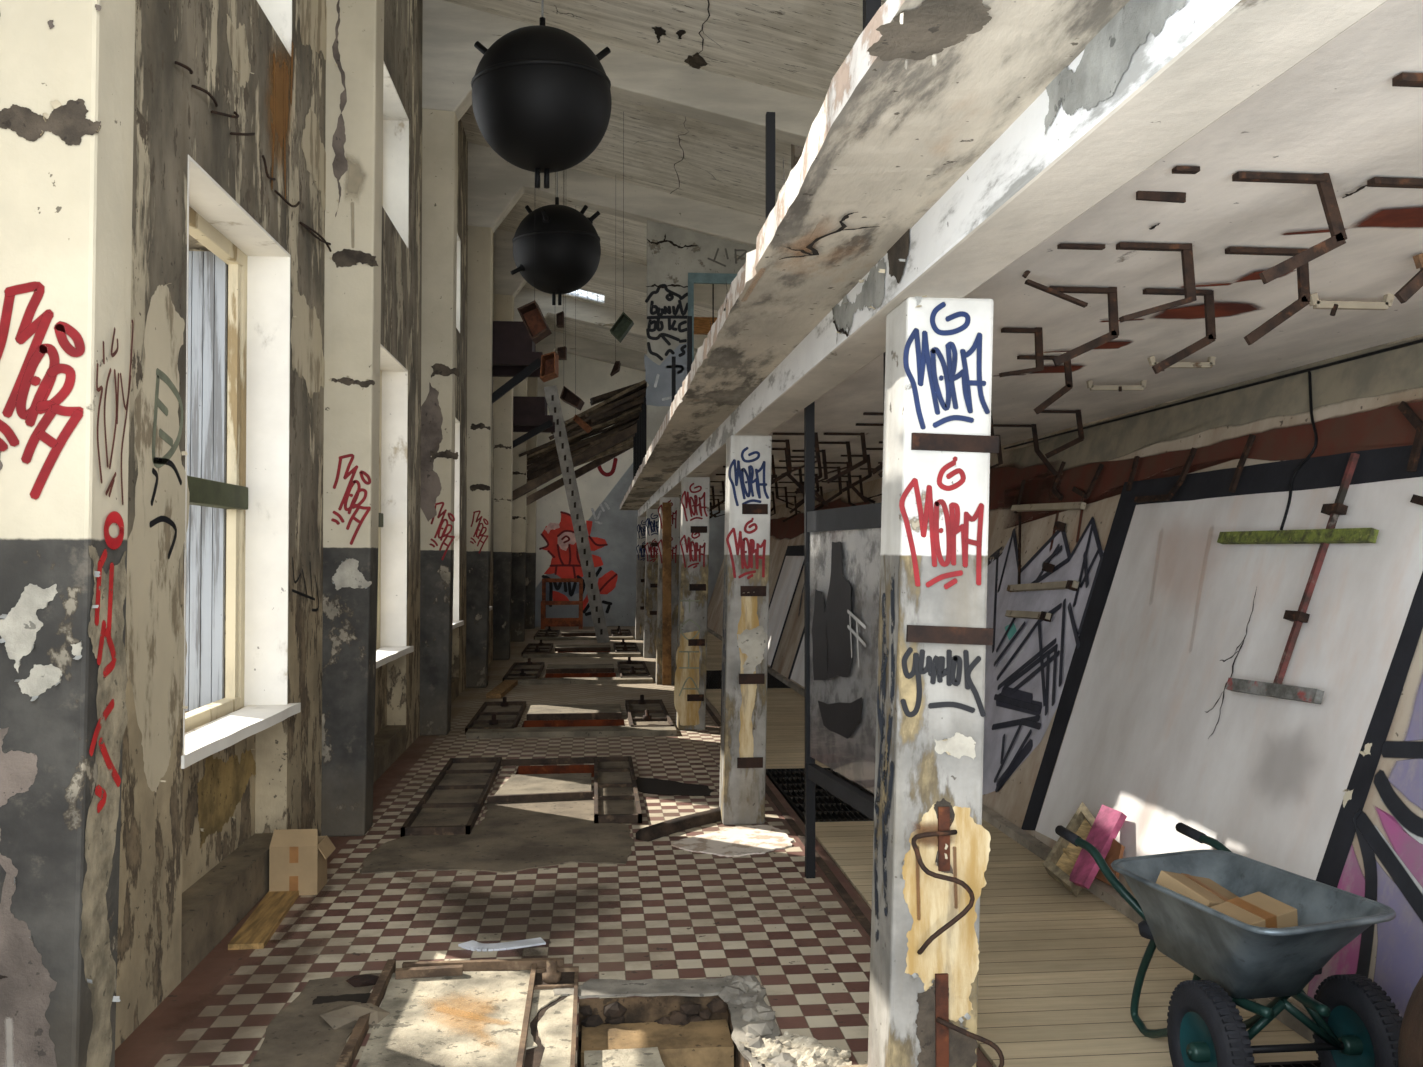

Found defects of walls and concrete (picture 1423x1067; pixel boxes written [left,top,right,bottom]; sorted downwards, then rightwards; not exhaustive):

spalling [0,98,101,146]
spalling [332,0,348,217]
crack [689,0,722,65]
peeling [1044,0,1186,134]
spalling [330,249,378,268]
peeling [332,558,372,590]
crack [1206,587,1257,739]
peeling [0,545,128,1067]
rust [916,825,958,920]
peeling [901,798,991,1067]